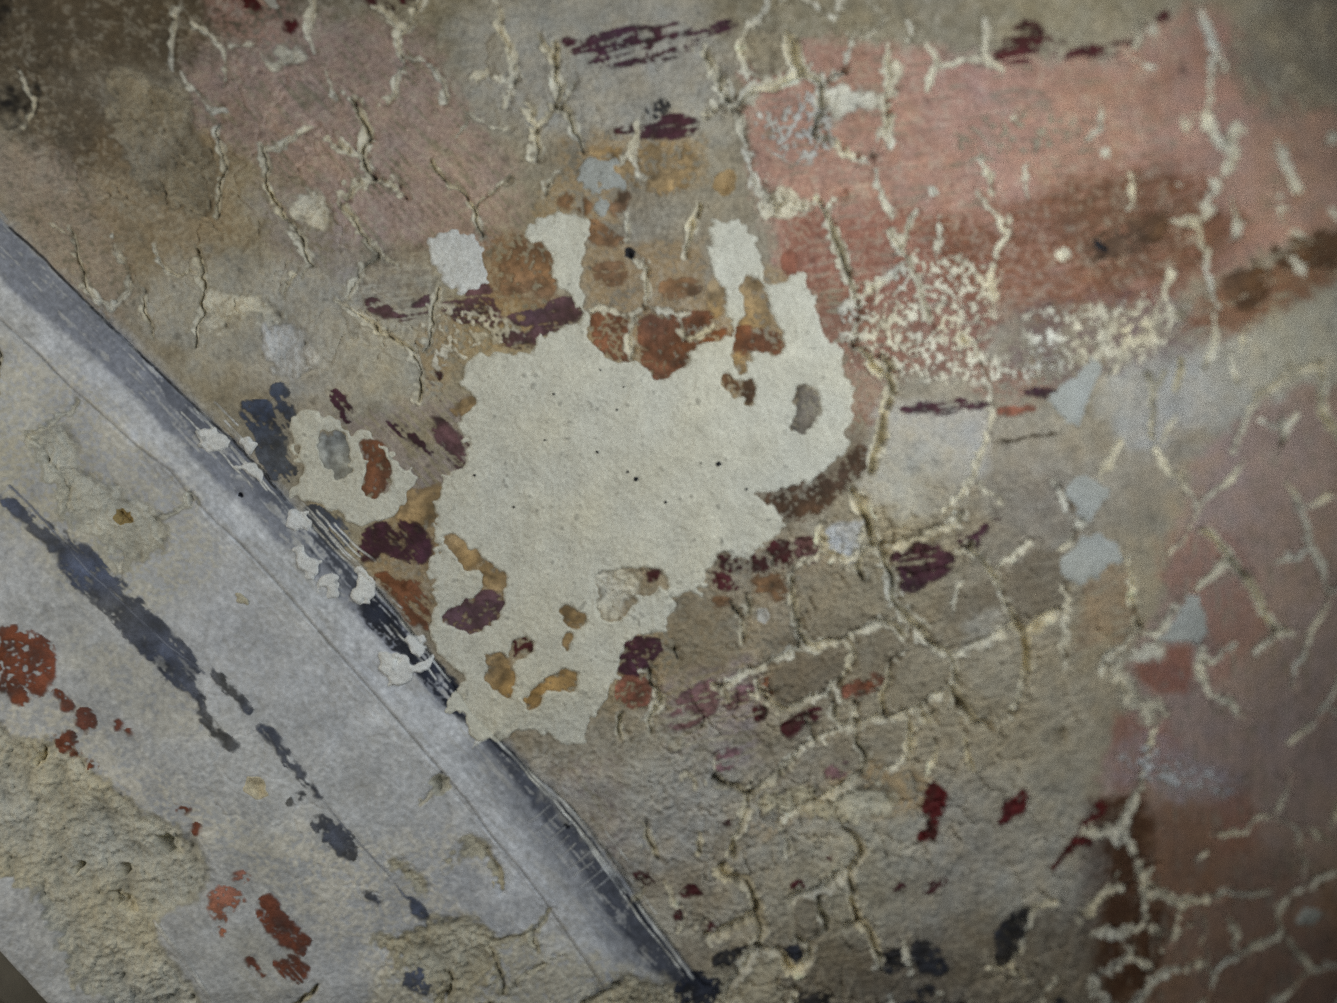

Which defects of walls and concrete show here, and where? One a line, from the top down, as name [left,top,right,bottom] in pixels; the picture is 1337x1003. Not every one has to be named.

crack [18,70,37,130]
crack [617,118,648,181]
flaking render [289,189,333,232]
crack [49,0,584,406]
peeling [421,304,519,371]
crack [589,202,715,361]
peeling [837,248,1178,390]
crack [629,0,1337,1003]
flaking render [594,568,642,620]
crack [614,649,679,740]
flaking render [0,725,209,1003]
flaking render [370,914,493,1003]